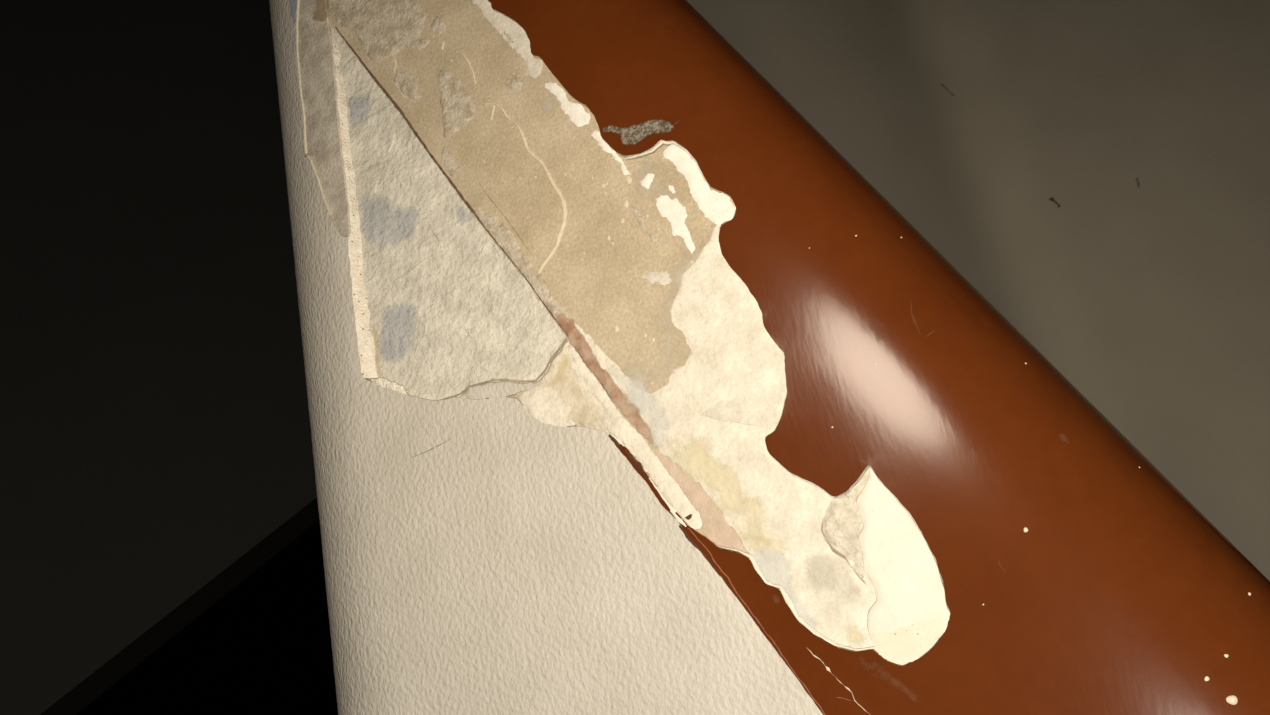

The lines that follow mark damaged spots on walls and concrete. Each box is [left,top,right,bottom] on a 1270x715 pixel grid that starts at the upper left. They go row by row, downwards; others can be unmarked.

peeling [289,0,951,666]
crack [609,433,868,715]